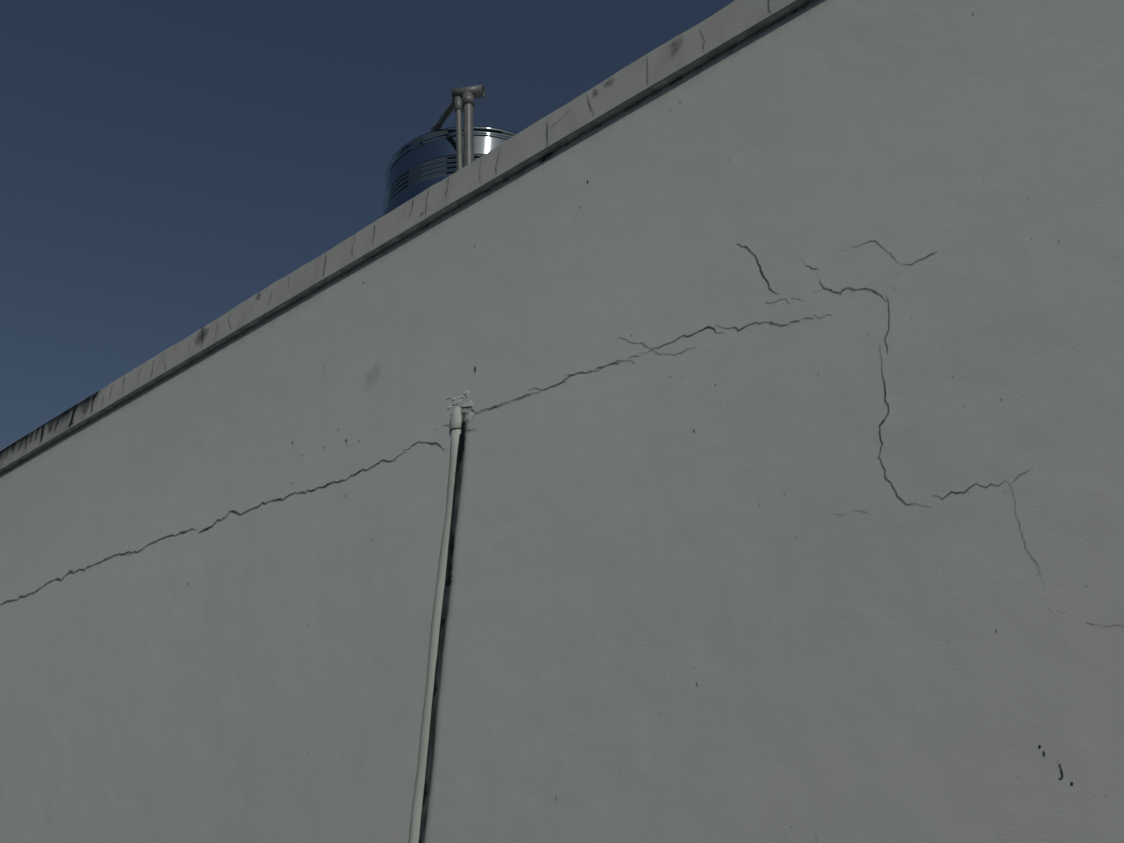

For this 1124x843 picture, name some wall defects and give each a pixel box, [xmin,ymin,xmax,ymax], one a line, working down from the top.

crack [743,246,772,291]
crack [644,320,799,348]
crack [472,362,618,411]
crack [810,266,910,505]
crack [2,442,441,604]